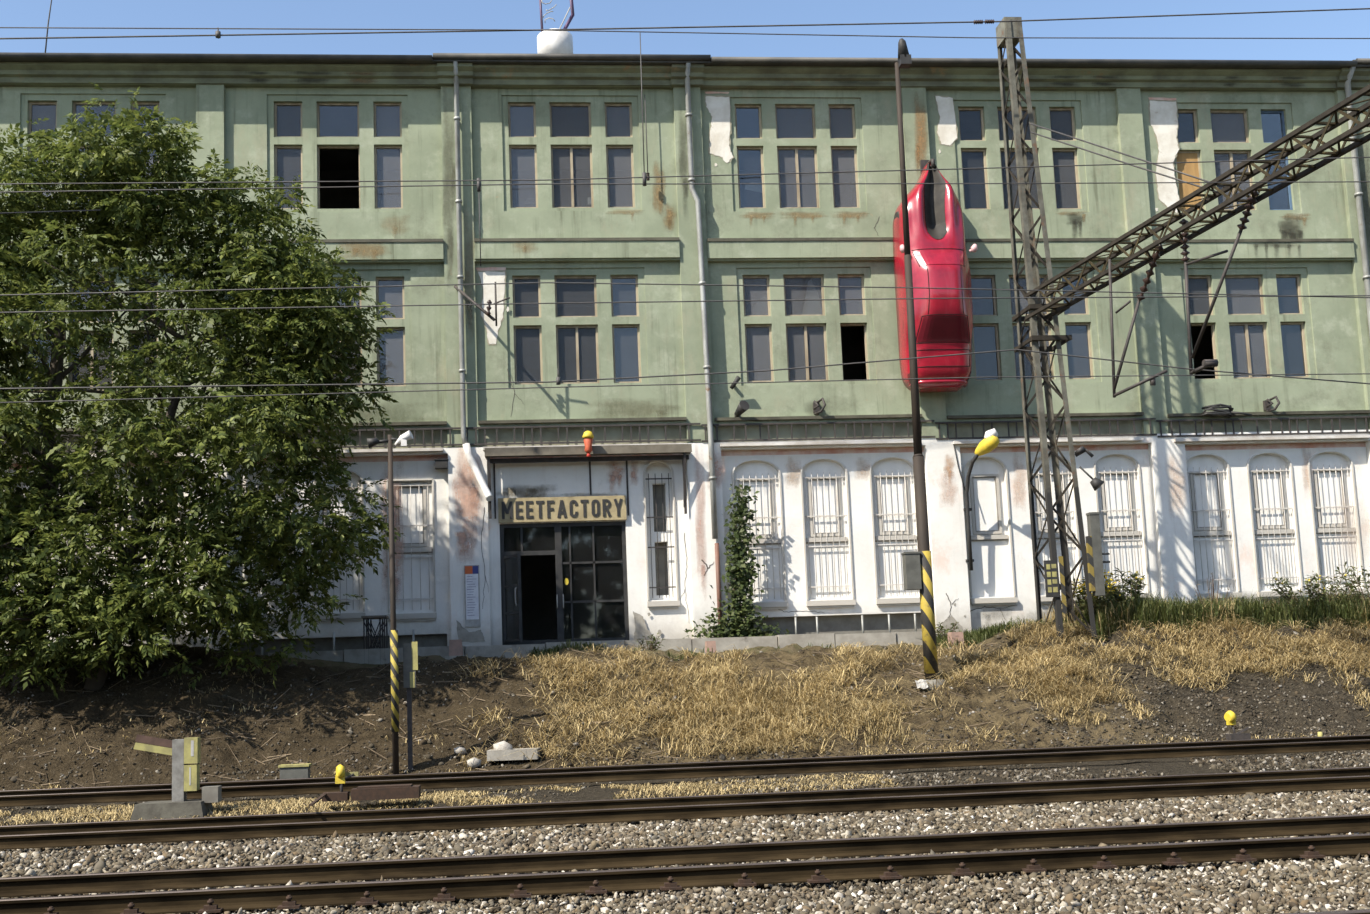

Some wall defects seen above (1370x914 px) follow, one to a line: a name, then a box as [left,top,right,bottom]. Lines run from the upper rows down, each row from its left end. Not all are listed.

peeling [704,91,734,166]
peeling [935,95,958,153]
peeling [1148,97,1180,214]
peeling [476,267,509,346]